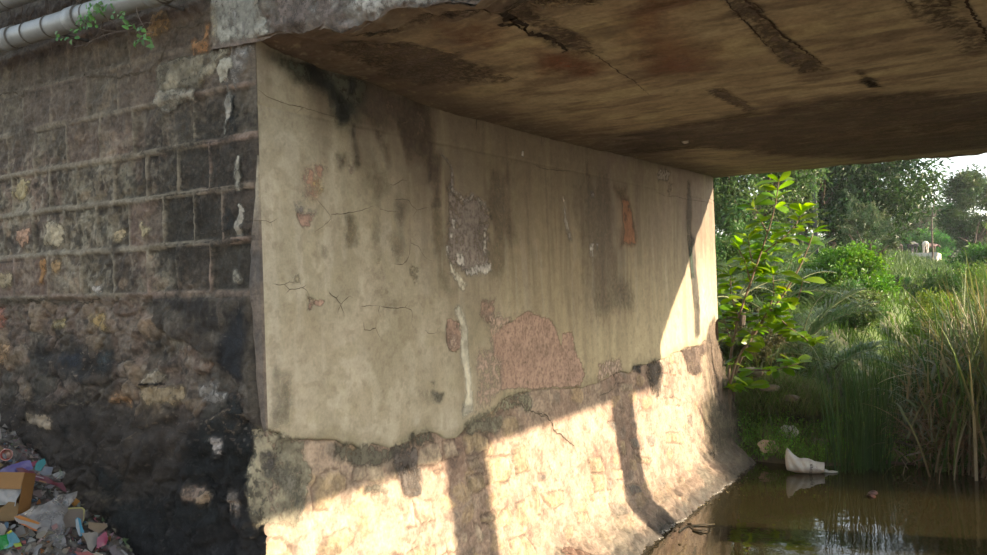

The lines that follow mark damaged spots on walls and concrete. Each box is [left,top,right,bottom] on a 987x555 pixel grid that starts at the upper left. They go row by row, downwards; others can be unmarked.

crack [465,5,568,53]
crack [726,0,821,64]
crack [905,0,987,42]
leakage [272,54,510,291]
crack [276,282,434,335]
peeling [446,318,461,352]
leakage [456,307,473,416]
peeling [465,300,585,435]
leakage [633,359,663,397]
leakage [683,182,745,456]